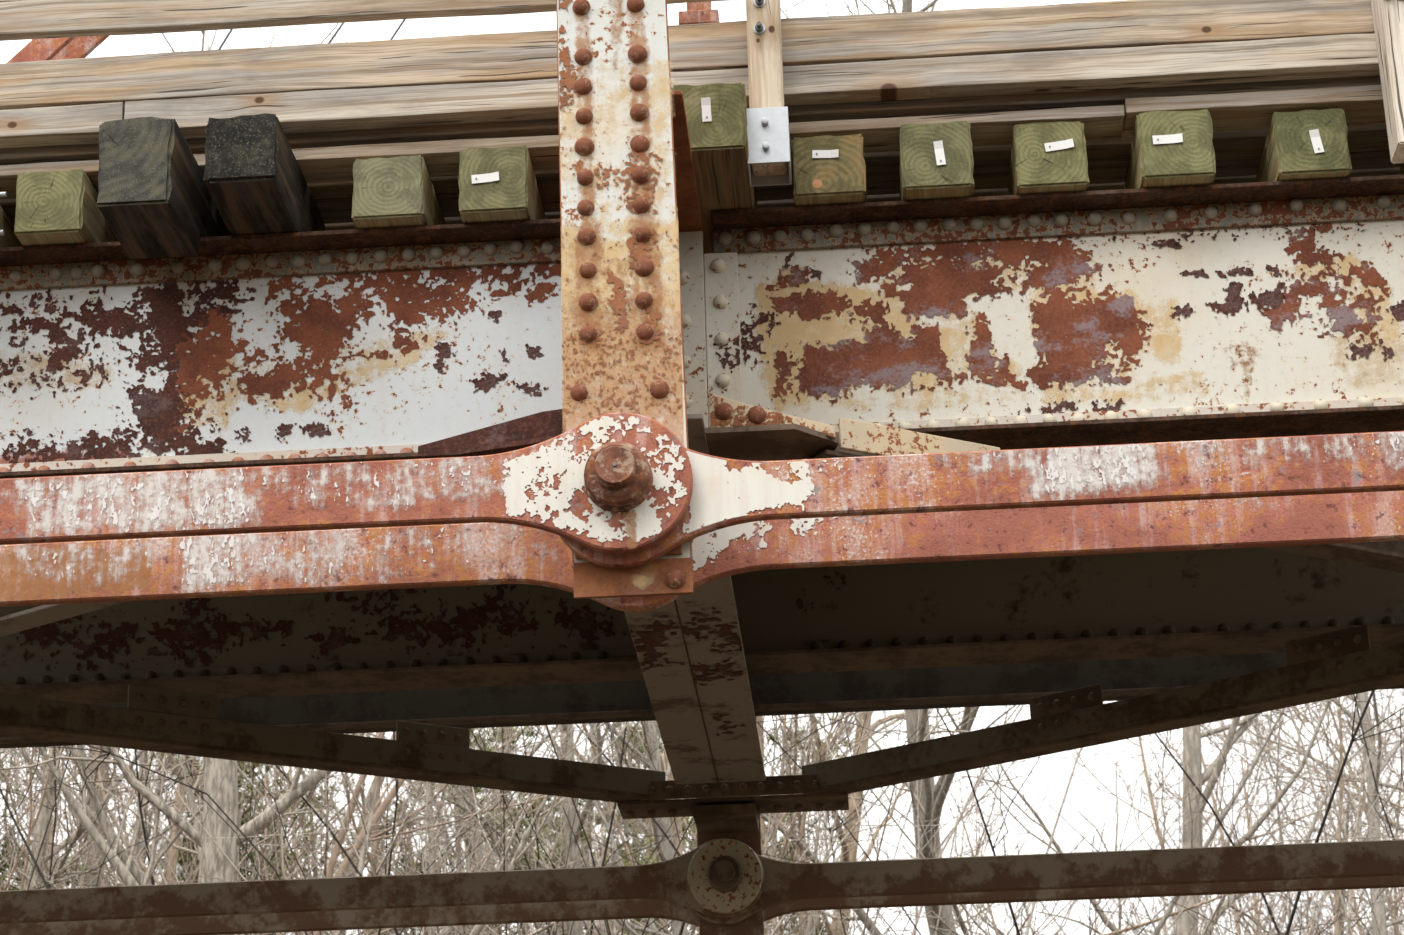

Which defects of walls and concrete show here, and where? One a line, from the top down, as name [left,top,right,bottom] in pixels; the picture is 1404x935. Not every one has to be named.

corrosion [0,0,683,464]
peeling [1055,225,1292,249]
corrosion [713,236,1207,410]
peeling [1169,264,1286,321]
corrosion [1261,223,1402,385]
peeling [1390,300,1404,324]
peeling [433,340,457,373]
peeling [469,348,549,396]
peeling [525,344,544,359]
peeling [1345,339,1396,362]
peeling [1004,398,1125,415]
peeling [6,416,853,593]